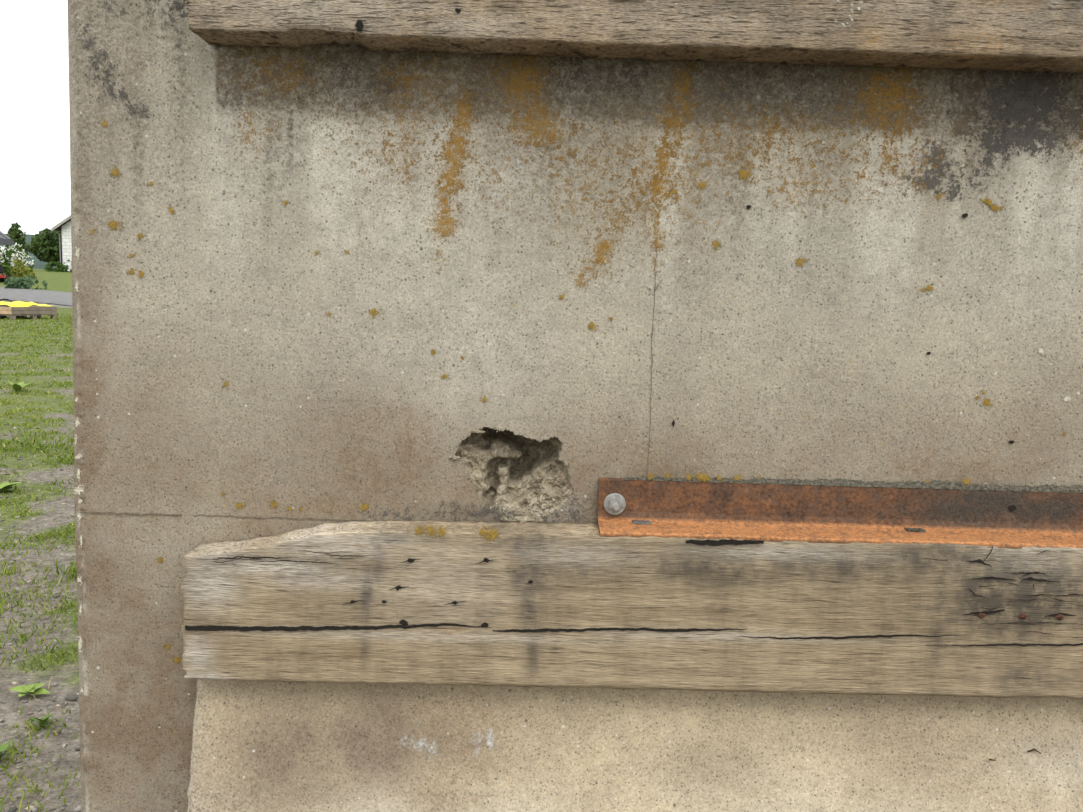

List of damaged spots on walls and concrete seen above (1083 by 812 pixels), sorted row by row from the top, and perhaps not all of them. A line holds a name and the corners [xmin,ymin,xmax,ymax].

crack [647,201,662,473]
spalling [448,427,574,523]